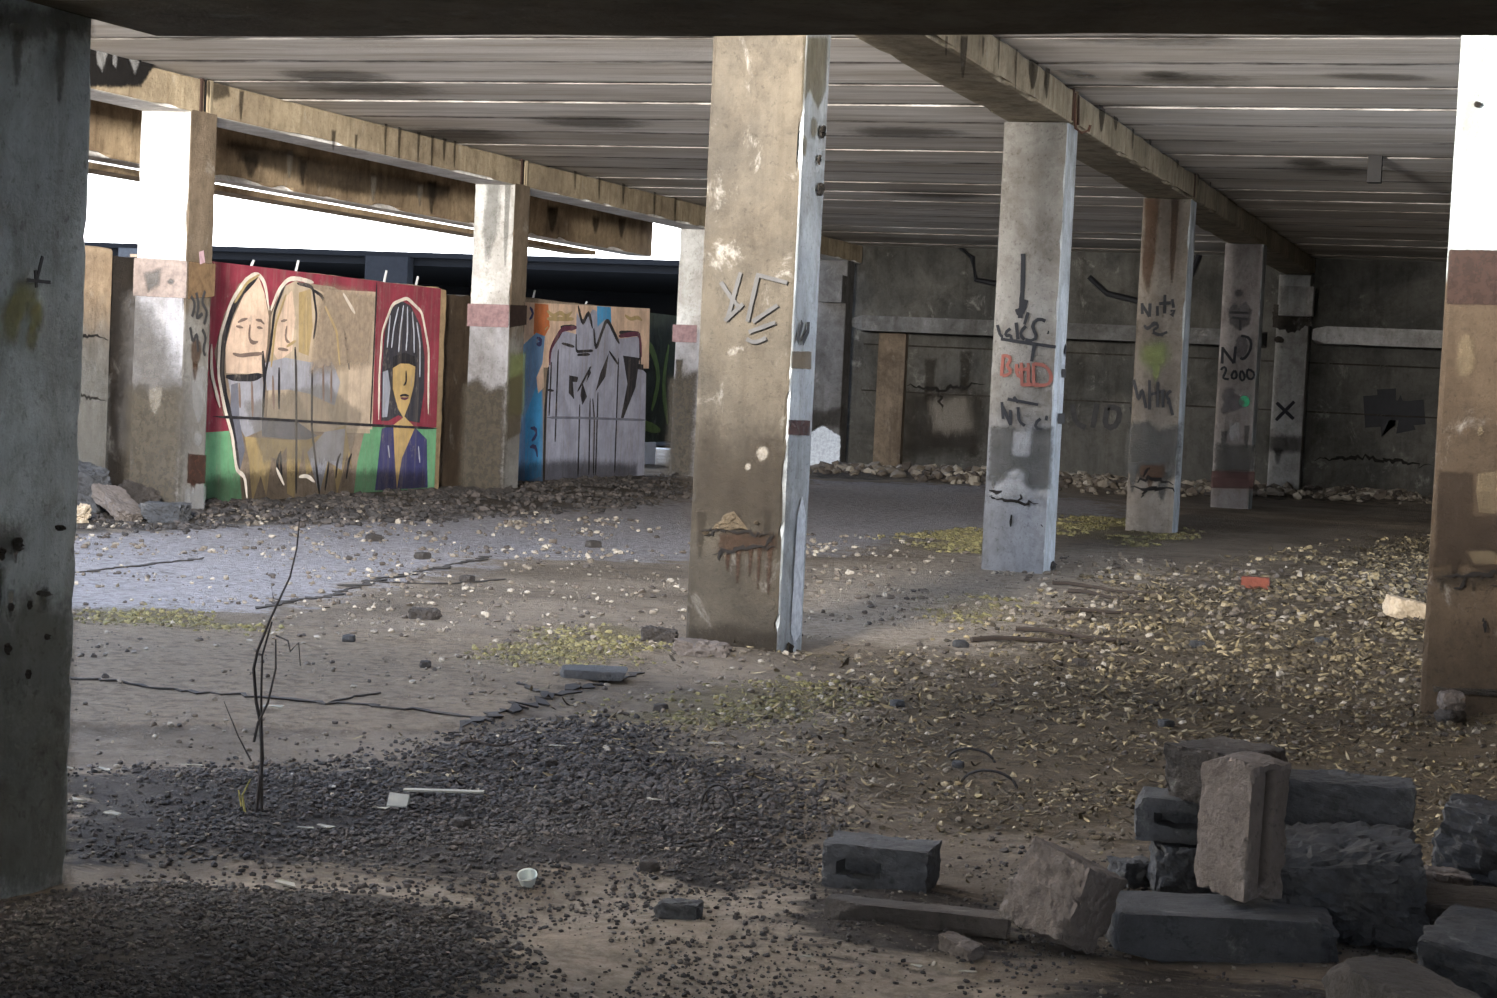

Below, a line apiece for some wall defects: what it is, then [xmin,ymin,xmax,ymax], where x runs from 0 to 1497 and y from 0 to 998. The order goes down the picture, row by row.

damp [206,81,243,117]
damp [231,124,456,213]
spalling [702,511,759,535]
spalling [0,537,24,561]
spalling [8,590,53,612]